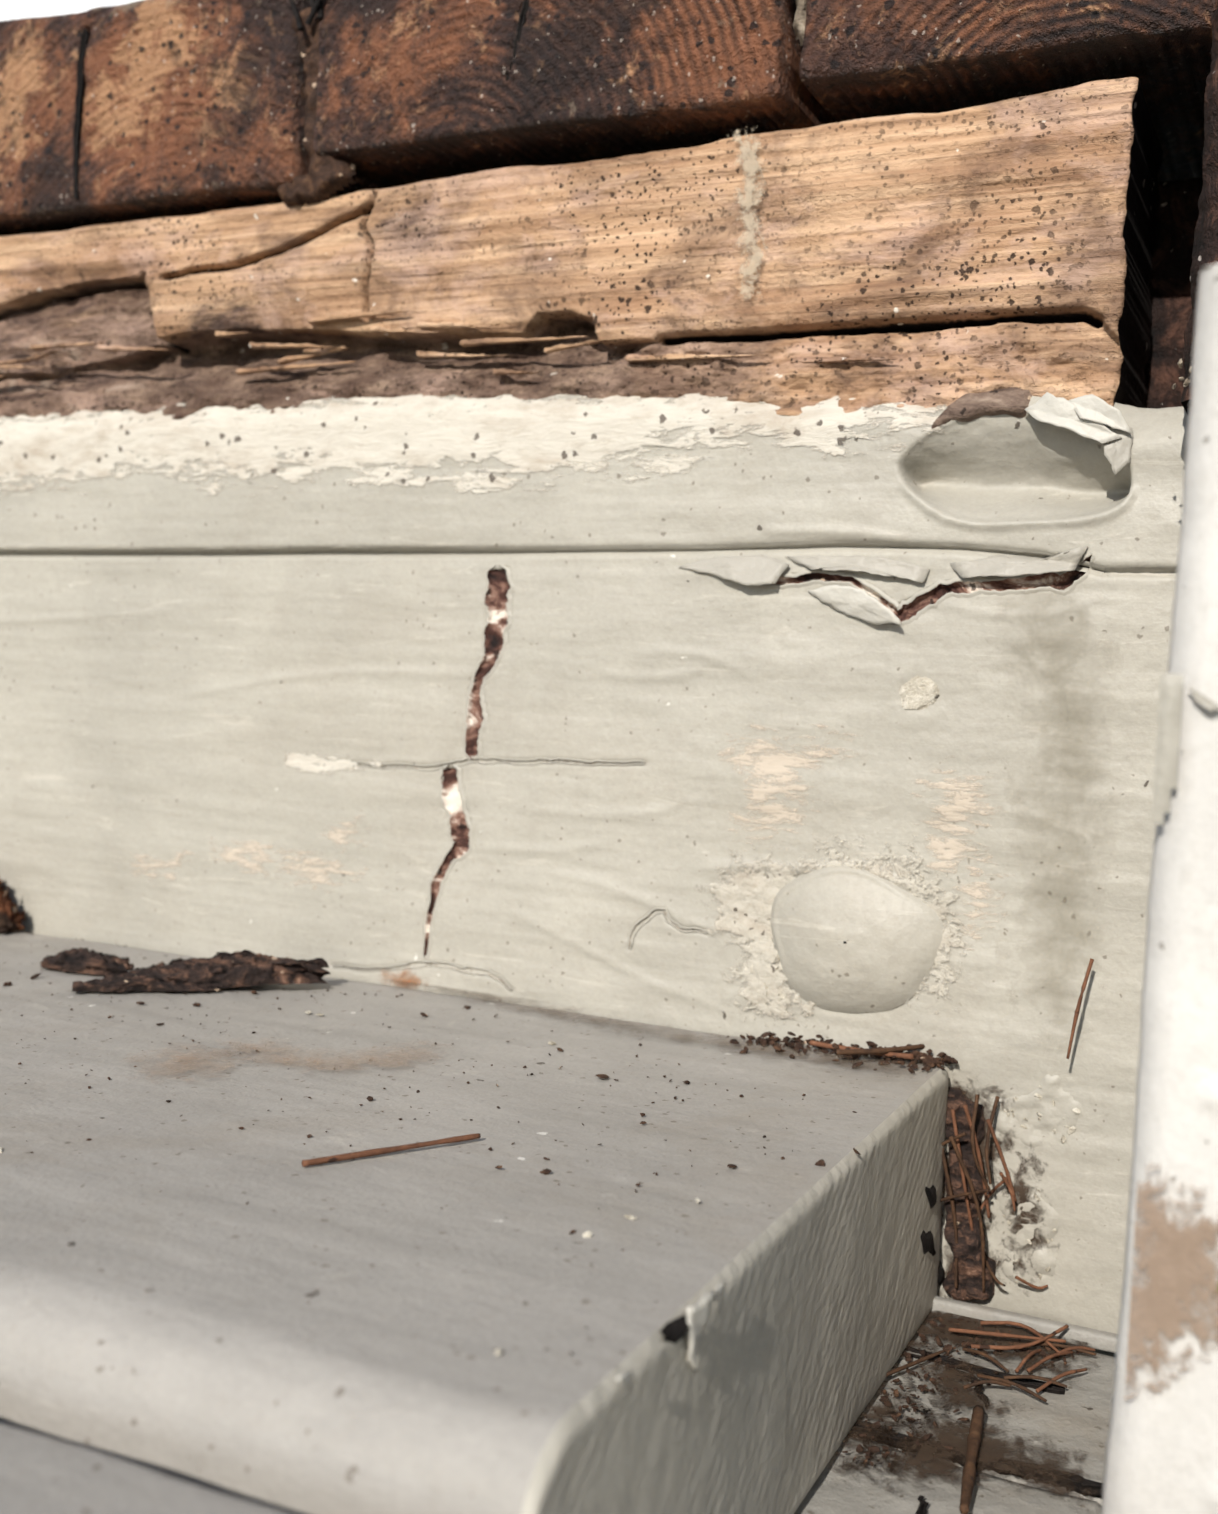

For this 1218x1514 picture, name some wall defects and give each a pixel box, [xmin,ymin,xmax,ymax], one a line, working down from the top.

peeling [0,387,1133,498]
crack [0,542,1105,992]
water stain [948,1081,1047,1270]